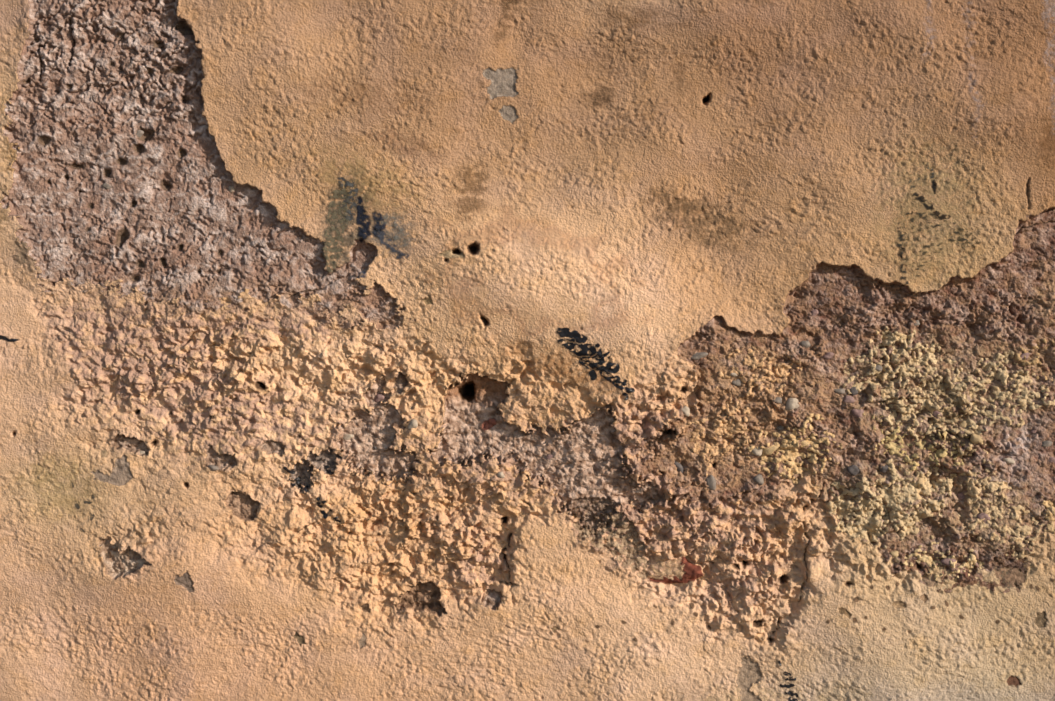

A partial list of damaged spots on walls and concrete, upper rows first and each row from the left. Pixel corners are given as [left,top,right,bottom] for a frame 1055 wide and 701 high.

peeling [482,68,518,124]
spalling [0,0,416,337]
spalling [428,208,1055,603]
peeling [91,434,149,486]
spalling [205,445,237,471]
spalling [260,440,284,456]
spalling [289,372,419,492]
spalling [225,492,260,521]
spalling [99,536,151,579]
peeling [174,571,194,592]
spalling [397,581,447,616]
spalling [482,589,502,609]